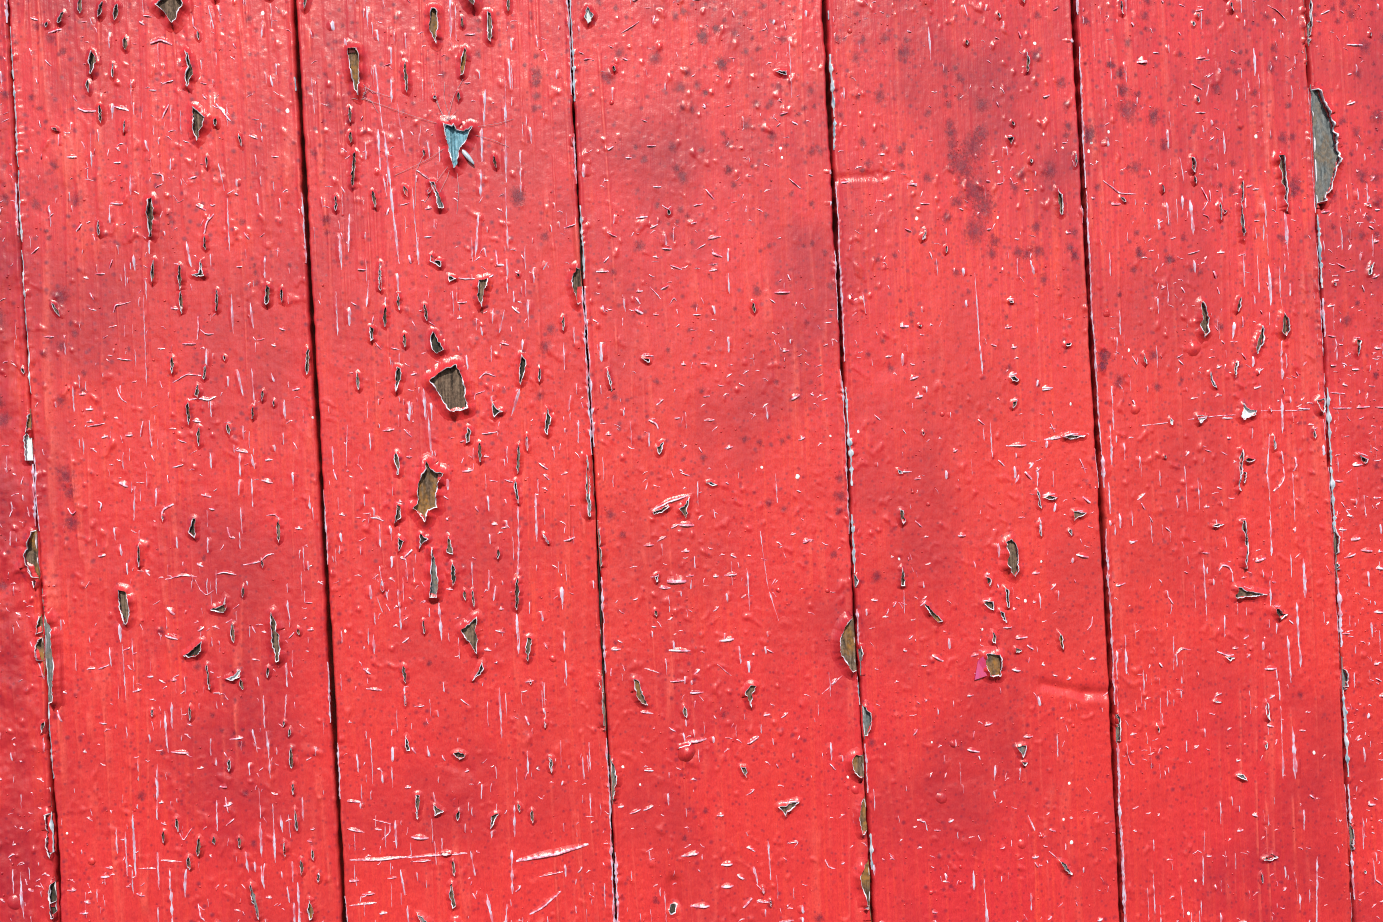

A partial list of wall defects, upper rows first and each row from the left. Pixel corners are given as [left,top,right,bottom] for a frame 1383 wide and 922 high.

peeling [147,0,217,167]
peeling [422,0,510,214]
peeling [2,0,66,922]
peeling [365,263,404,346]
peeling [389,448,488,683]
peeling [390,305,507,462]
peeling [426,251,494,313]
peeling [974,531,1025,684]
peeling [1304,82,1347,356]
peeling [829,609,877,922]